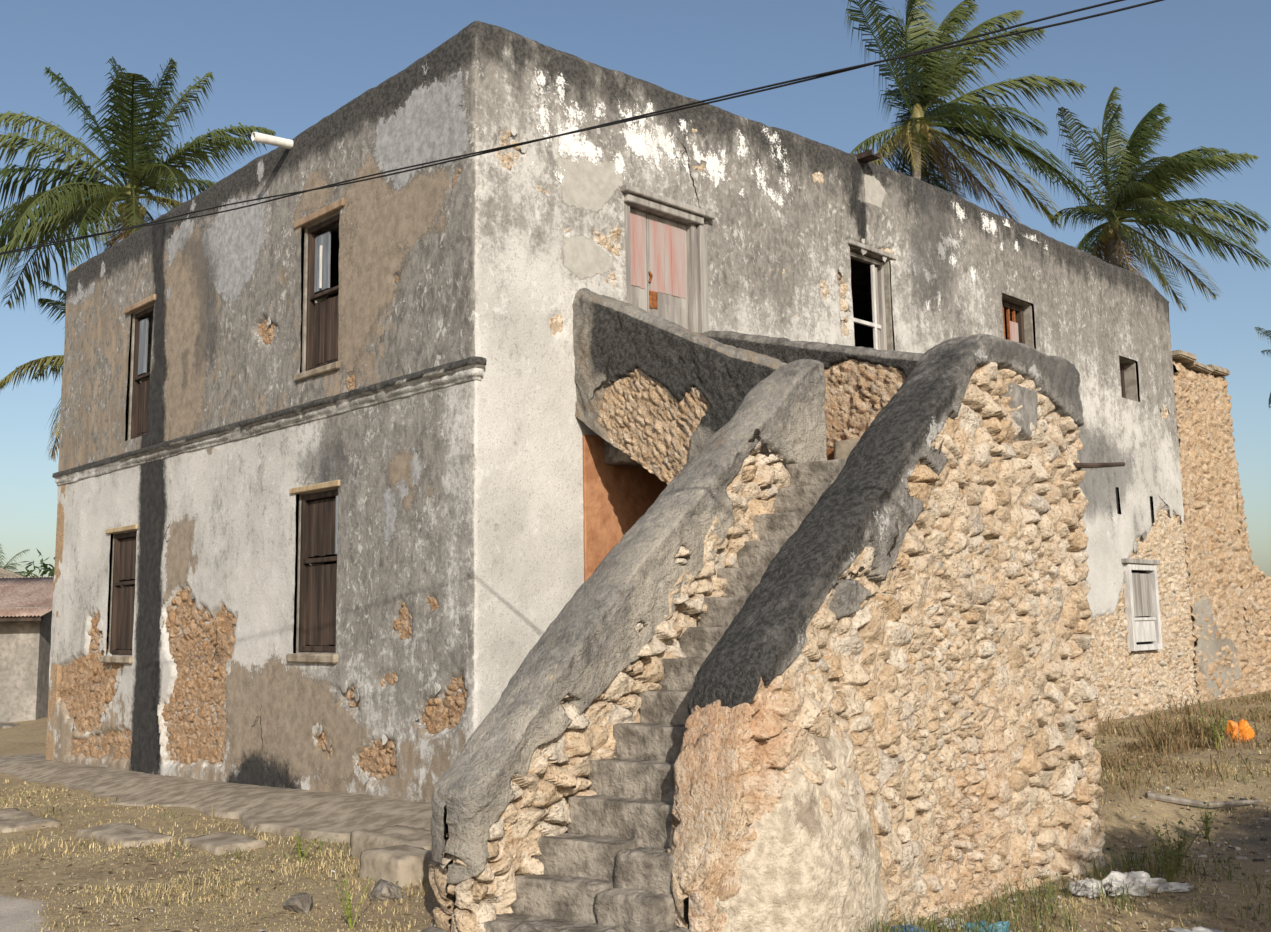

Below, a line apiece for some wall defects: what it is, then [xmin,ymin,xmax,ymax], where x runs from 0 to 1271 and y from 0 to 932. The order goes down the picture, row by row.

flaking render [593,227,622,256]
peeling [495,69,794,210]
leakage [130,215,167,775]
flaking render [59,611,132,761]
flaking render [160,514,398,787]
flaking render [1090,504,1200,723]